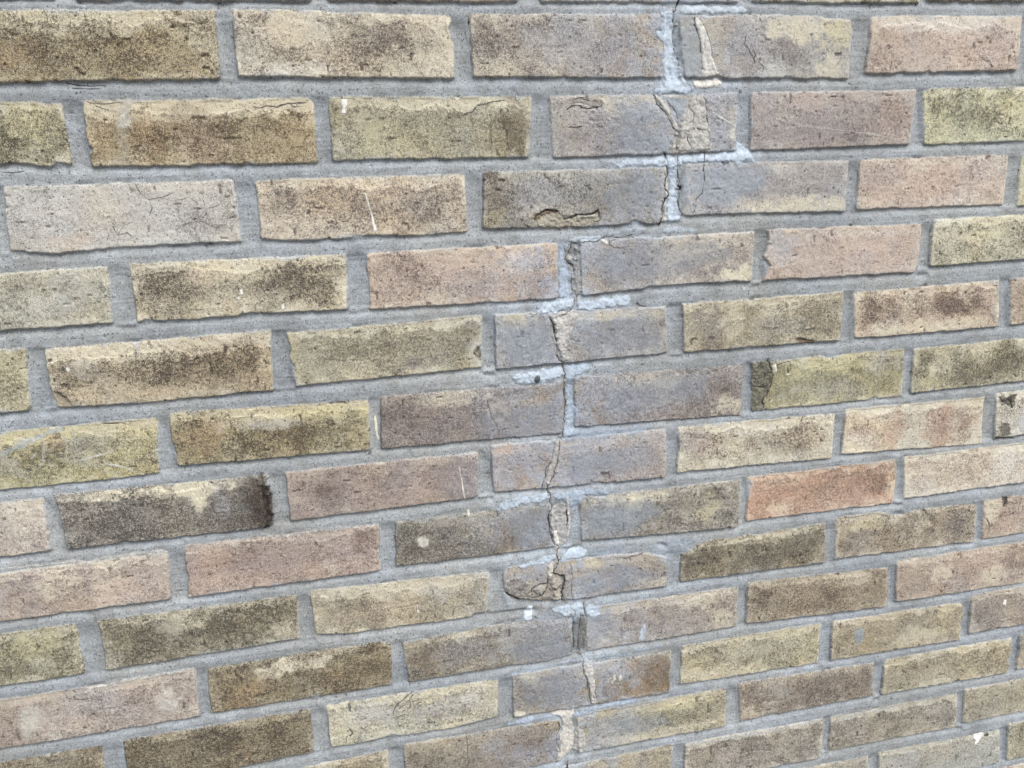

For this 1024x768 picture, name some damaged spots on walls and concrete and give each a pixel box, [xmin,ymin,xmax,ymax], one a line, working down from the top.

crack [539,0,712,704]